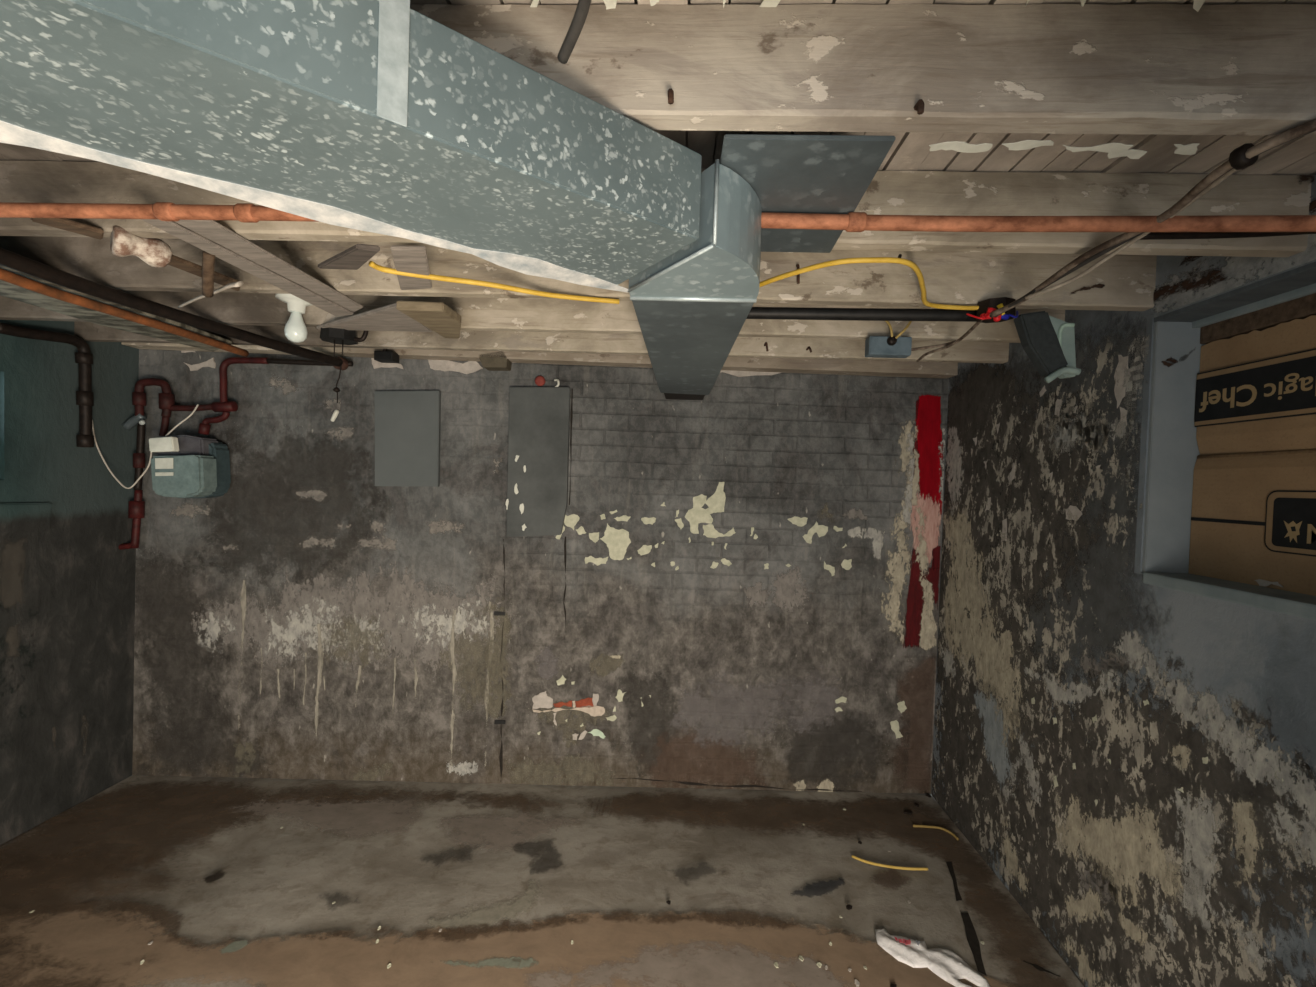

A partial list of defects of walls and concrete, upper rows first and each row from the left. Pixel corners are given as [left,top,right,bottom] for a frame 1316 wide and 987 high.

peeling [929,140,1147,159]
peeling [1174,143,1199,155]
peeling [1029,335,1149,523]
peeling [555,482,758,570]
peeling [788,503,868,576]
damp [0,318,1316,987]
spalling [531,675,626,747]